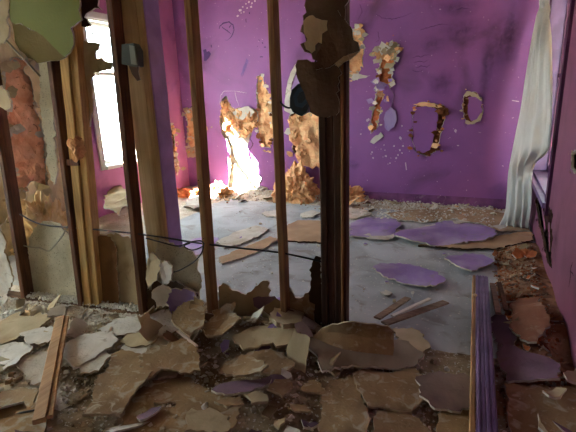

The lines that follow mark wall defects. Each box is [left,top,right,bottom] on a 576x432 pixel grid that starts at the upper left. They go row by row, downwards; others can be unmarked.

spalling [0,50,48,193]
spalling [170,107,196,175]
spalling [219,74,273,189]
spalling [284,112,319,169]
spalling [349,24,403,145]
spalling [389,101,449,164]
spalling [460,89,483,125]